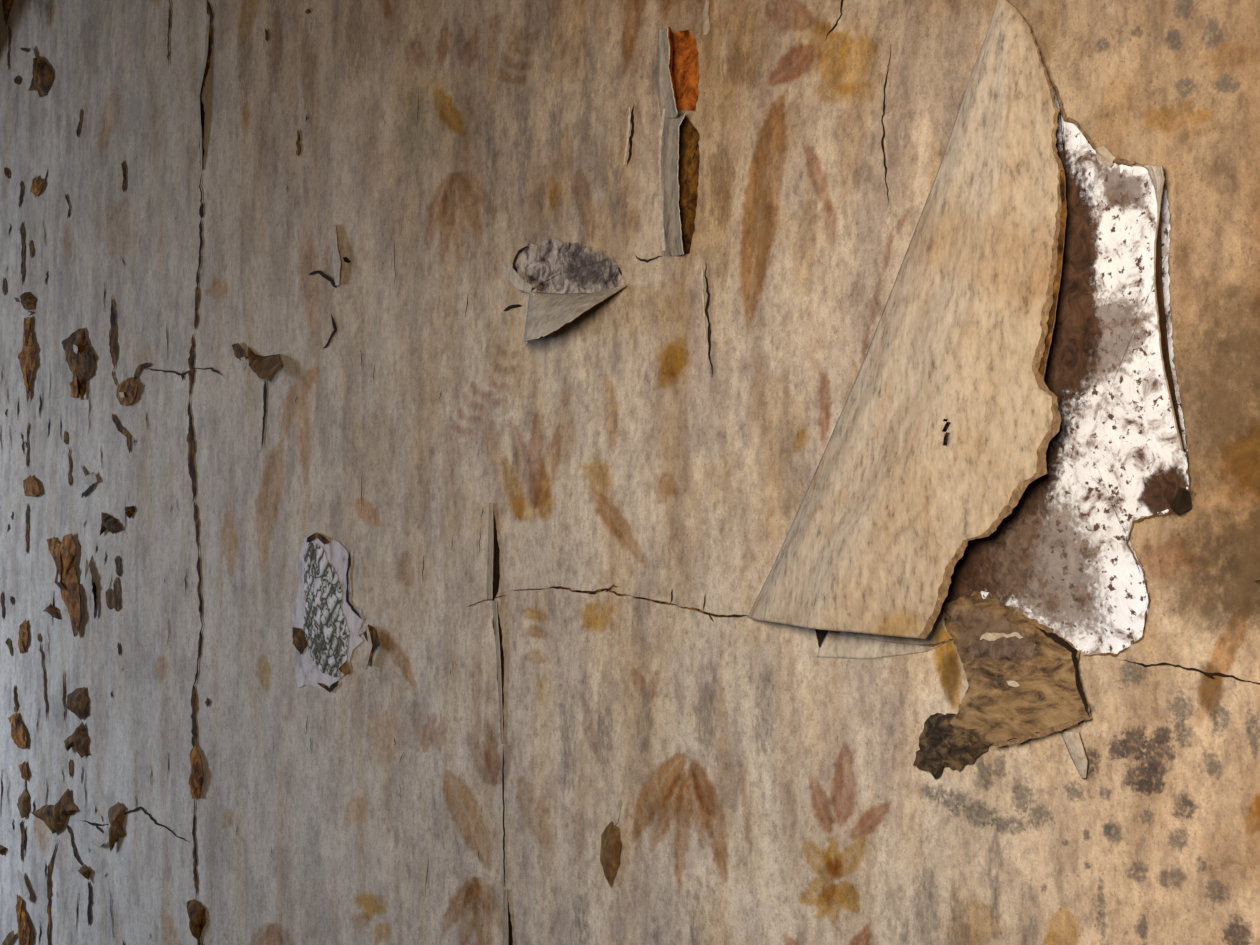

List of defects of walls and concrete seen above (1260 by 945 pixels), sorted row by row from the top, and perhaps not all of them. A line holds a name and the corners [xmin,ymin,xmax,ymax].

crack [296,116,307,157]
peeling [748,0,1192,659]
crack [0,0,226,945]
peeling [78,555,98,619]
peeling [292,532,379,692]
crack [467,584,748,622]
crack [1118,659,1260,685]
water stain [1086,699,1189,794]
peeling [90,802,126,852]
water stain [1174,795,1196,818]
peeling [70,864,92,926]
water stain [1223,918,1250,945]